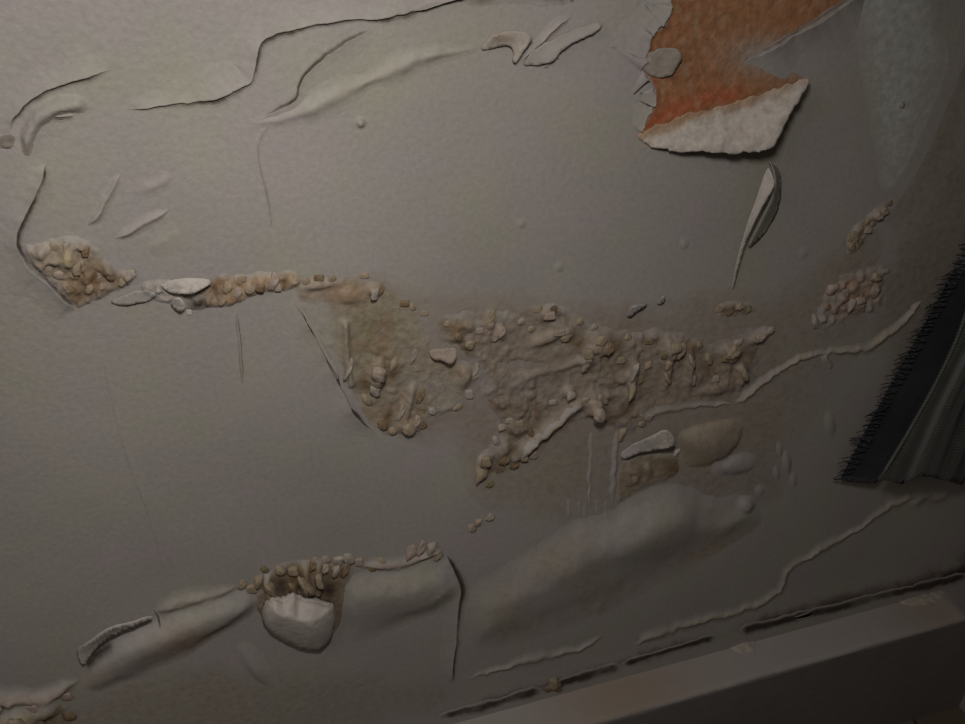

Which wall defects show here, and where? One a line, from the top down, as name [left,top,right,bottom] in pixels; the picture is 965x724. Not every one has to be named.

peeling [415,0,603,68]
peeling [608,0,864,289]
spalling [0,163,775,504]
spalling [811,264,889,333]
crack [436,555,471,684]
crack [739,573,965,636]
spalling [0,677,80,724]
crack [439,634,717,718]